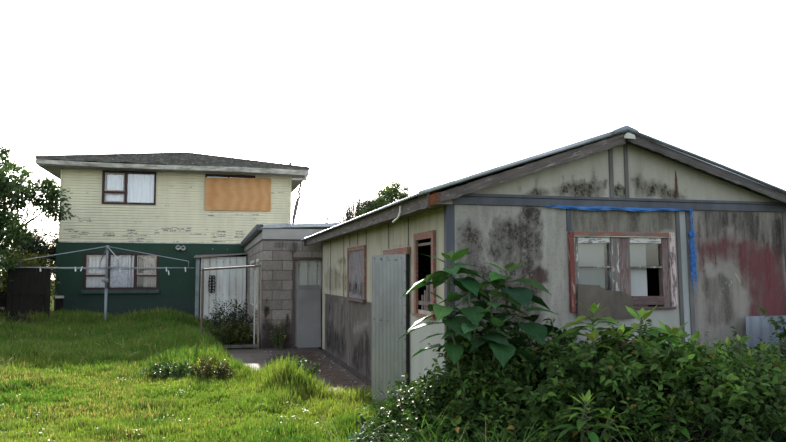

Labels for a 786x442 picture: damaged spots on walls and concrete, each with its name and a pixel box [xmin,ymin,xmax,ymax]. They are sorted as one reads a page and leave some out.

leakage [562,182,600,197]
peeling [103,227,245,243]
leakage [460,206,547,324]